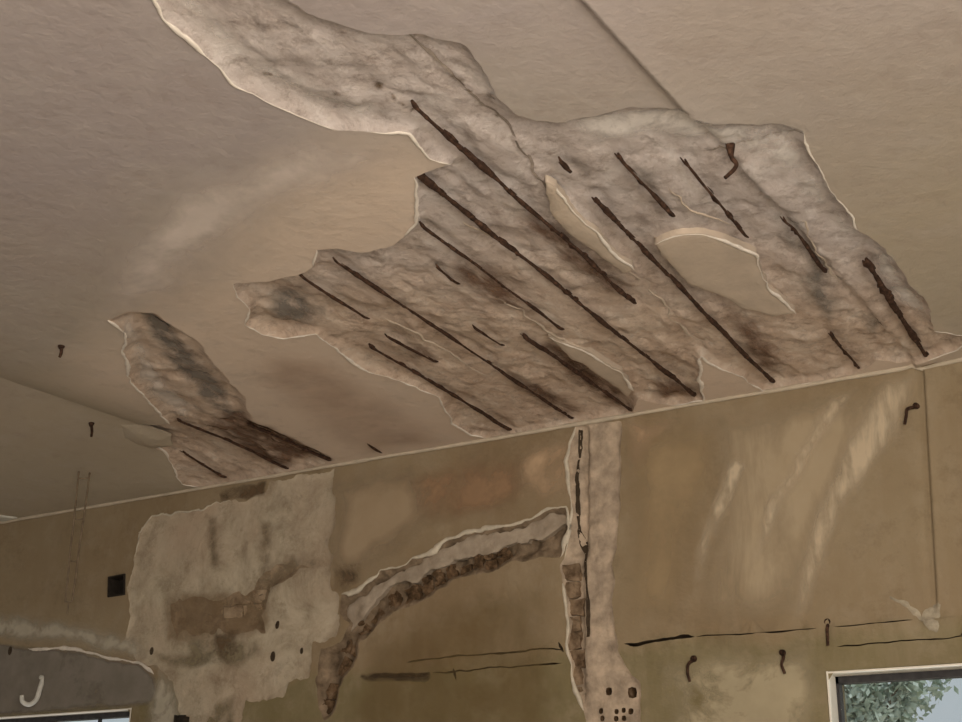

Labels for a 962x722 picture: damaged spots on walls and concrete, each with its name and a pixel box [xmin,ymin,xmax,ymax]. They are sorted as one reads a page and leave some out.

rust [211,412,311,462]
peeling [124,418,567,722]
spalling [332,257,574,431]
rust [461,268,515,306]
peeling [393,96,637,304]
spalling [417,173,697,412]
flaking render [562,563,586,692]
rust [552,346,621,404]
spalling [599,687,637,722]
peeling [591,152,795,383]
water stain [714,384,906,603]
spalling [862,257,929,357]